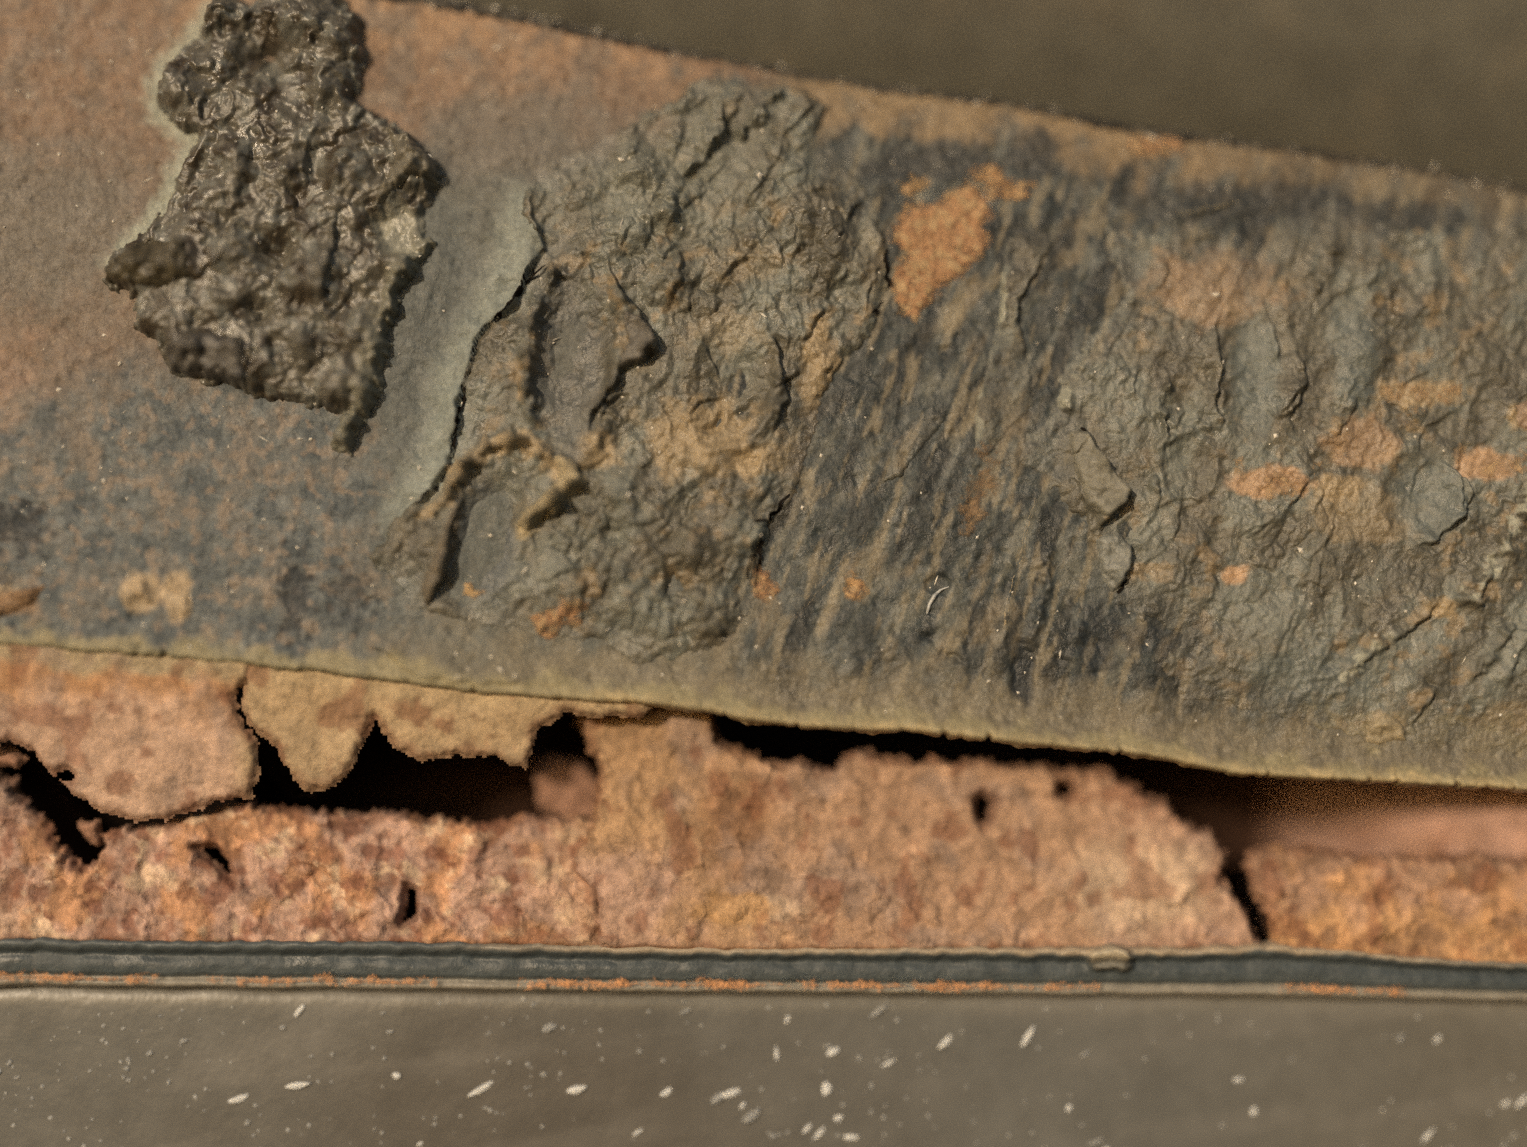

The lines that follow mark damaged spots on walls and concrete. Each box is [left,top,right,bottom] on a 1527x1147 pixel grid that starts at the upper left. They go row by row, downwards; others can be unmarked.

rust [891,165,1036,320]
peeling [974,199,1527,757]
rust [0,645,1527,963]
rust [0,972,138,983]
rust [238,977,414,985]
rust [527,978,631,989]
rust [652,979,760,989]
rust [811,981,898,989]
rust [916,982,1001,991]
rust [1288,984,1398,996]